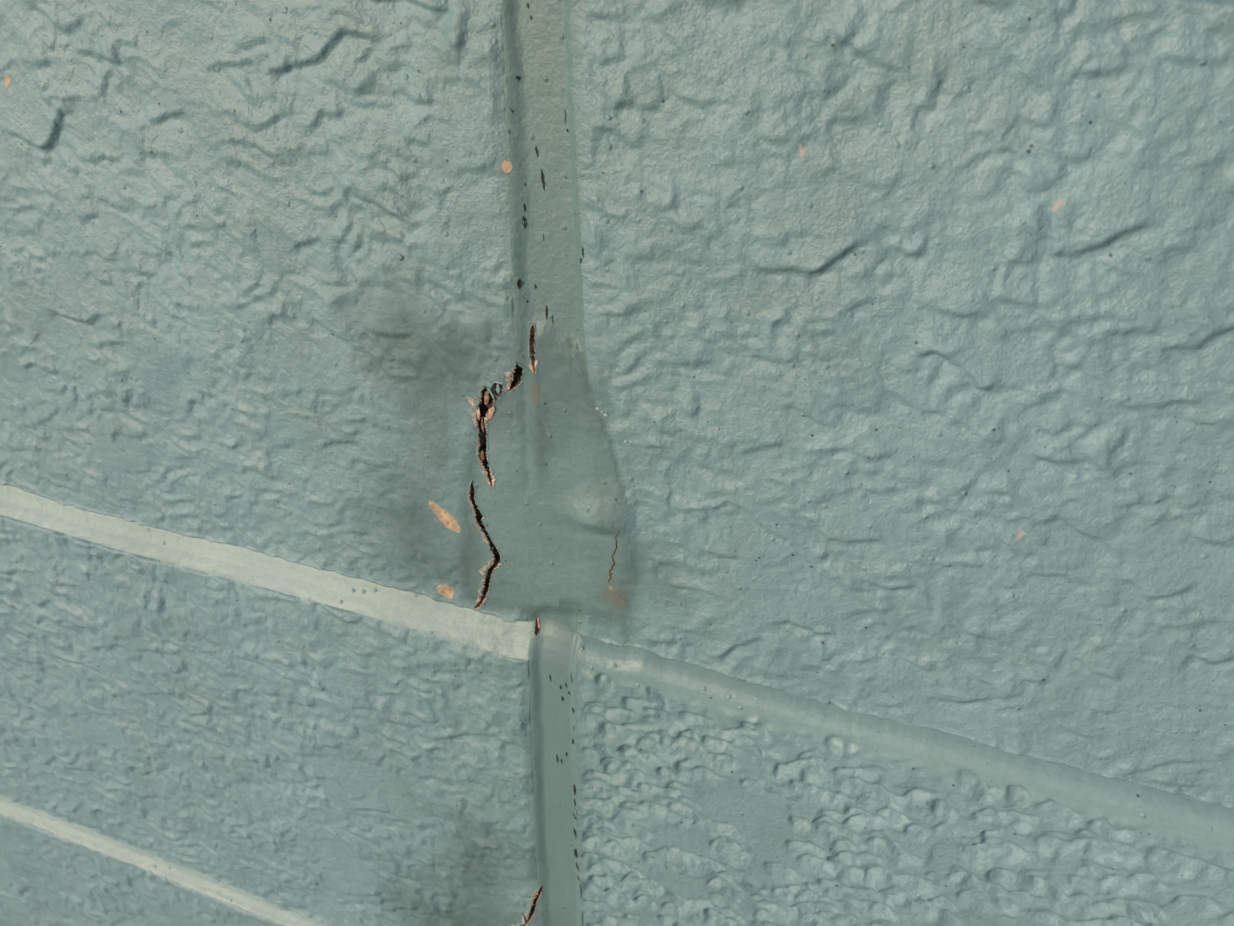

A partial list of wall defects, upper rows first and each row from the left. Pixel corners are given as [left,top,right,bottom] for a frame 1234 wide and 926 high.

crack [521,146,545,241]
crack [466,278,554,610]
crack [511,886,544,926]